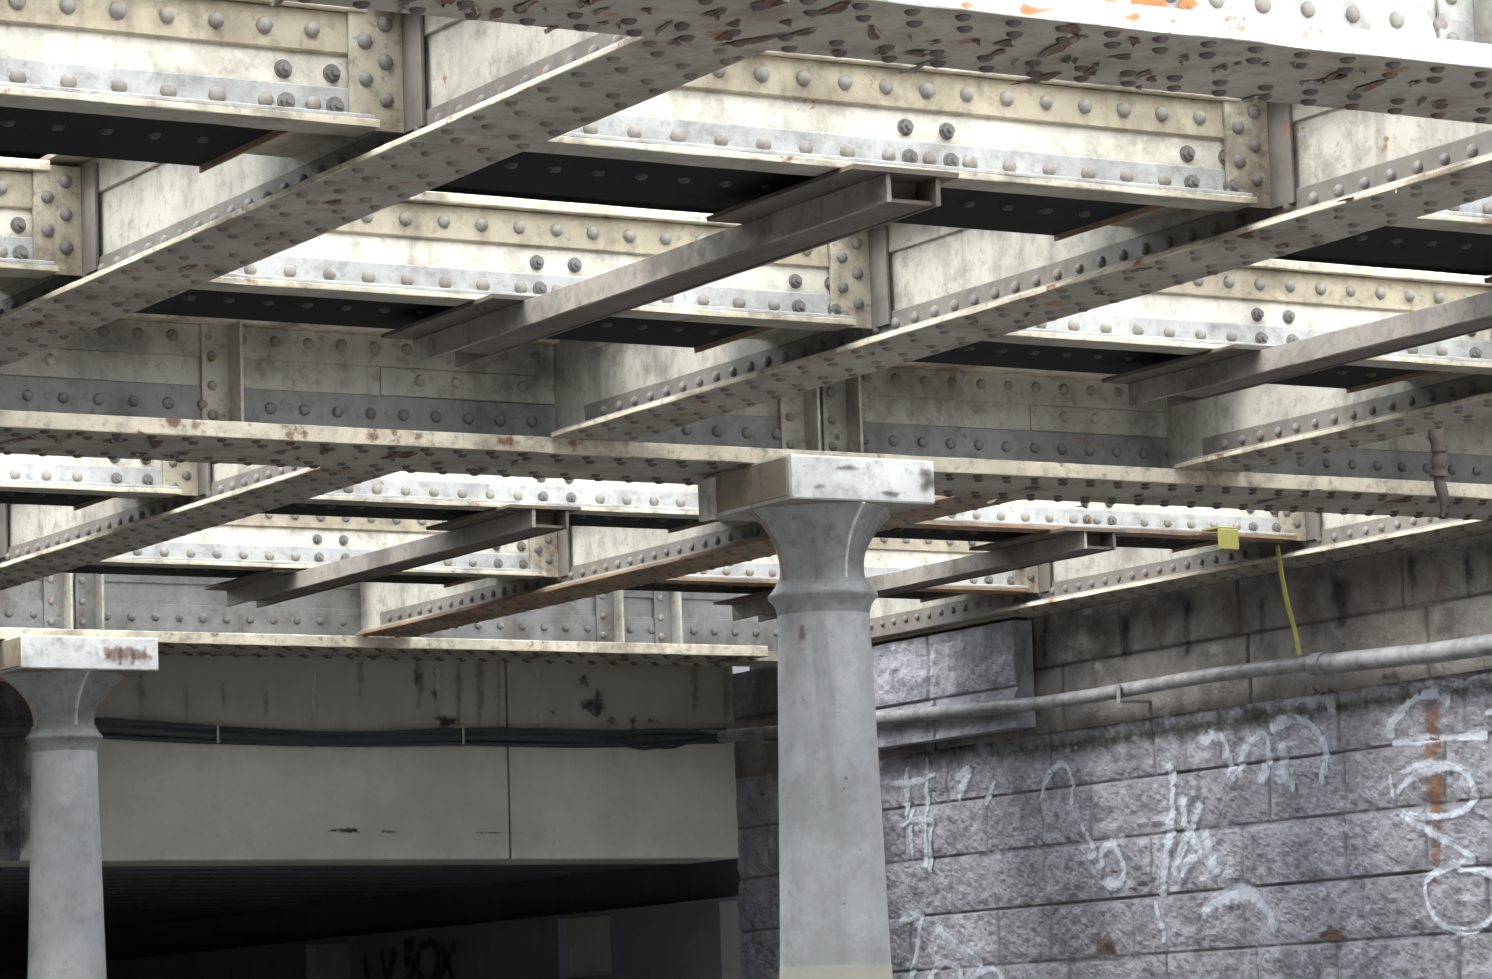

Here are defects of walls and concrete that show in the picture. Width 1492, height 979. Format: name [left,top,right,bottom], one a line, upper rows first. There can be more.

rust [1020,3,1052,14]
rust [1102,0,1200,23]
leakage [0,682,33,720]
leakage [581,675,654,729]
leakage [0,737,31,847]
rust [1425,707,1443,880]